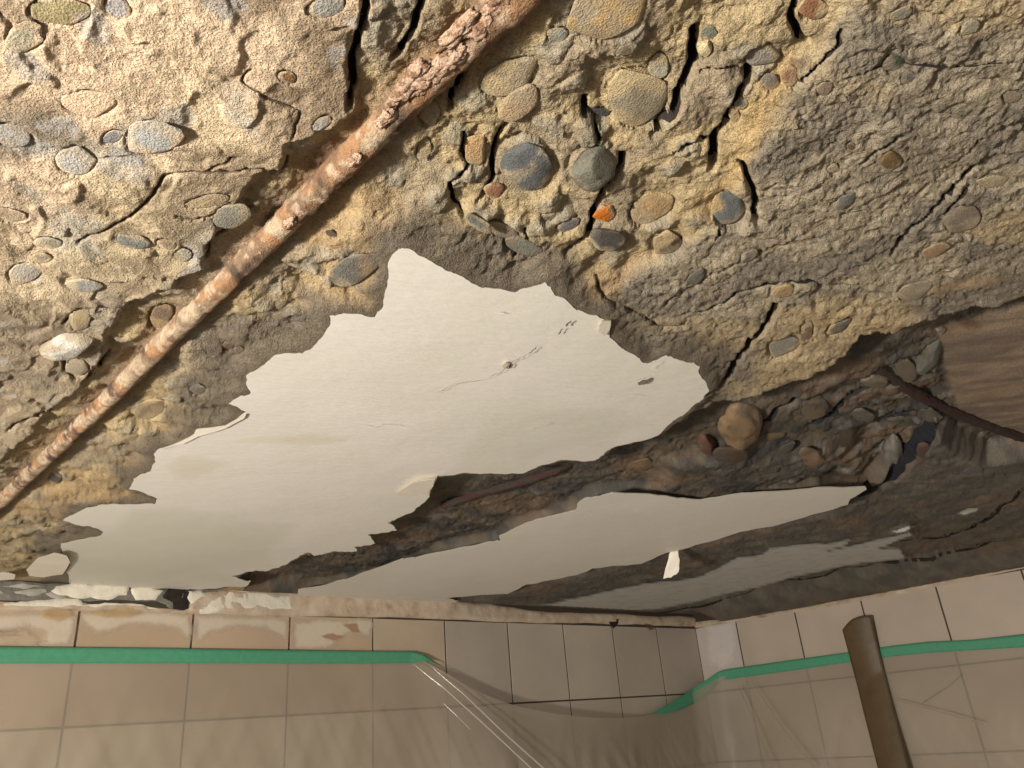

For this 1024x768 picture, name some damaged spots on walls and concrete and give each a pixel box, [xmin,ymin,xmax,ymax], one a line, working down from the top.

crack [347,0,370,99]
crack [397,0,423,50]
crack [448,72,464,100]
crack [654,23,751,155]
crack [84,70,301,237]
crack [181,214,225,254]
crack [448,125,502,211]
crack [579,93,623,240]
crack [741,160,759,214]
crack [757,209,865,255]
crack [891,138,984,250]
spalling [0,0,1024,614]